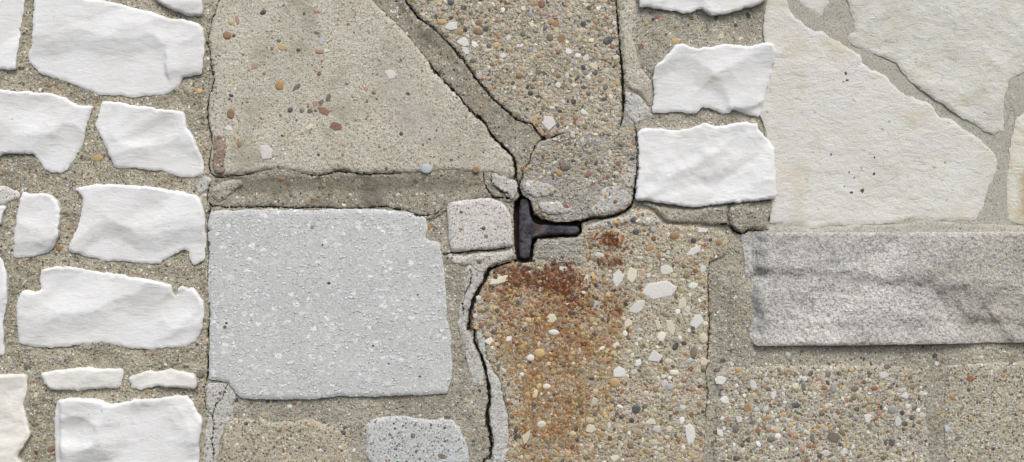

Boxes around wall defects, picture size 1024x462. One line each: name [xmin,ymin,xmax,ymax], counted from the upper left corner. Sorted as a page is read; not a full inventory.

crack [406,1,562,199]
crack [576,0,639,225]
crack [443,248,516,462]
corrosion [477,226,635,461]